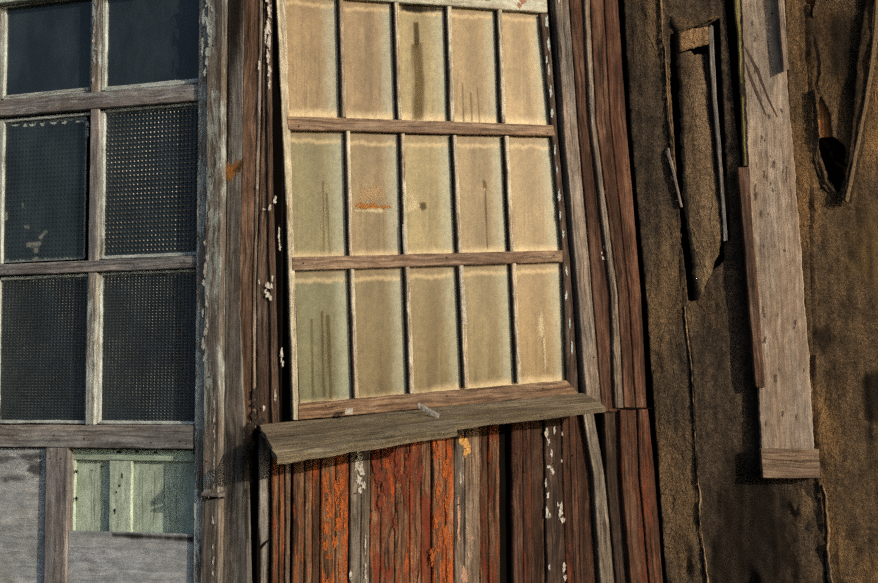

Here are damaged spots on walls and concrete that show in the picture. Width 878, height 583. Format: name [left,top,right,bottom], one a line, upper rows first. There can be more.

peeling [201,0,214,76]
peeling [258,0,272,88]
peeling [322,469,352,583]
peeling [355,446,424,513]
peeling [430,439,476,583]
peeling [459,434,473,457]
peeling [545,427,565,523]